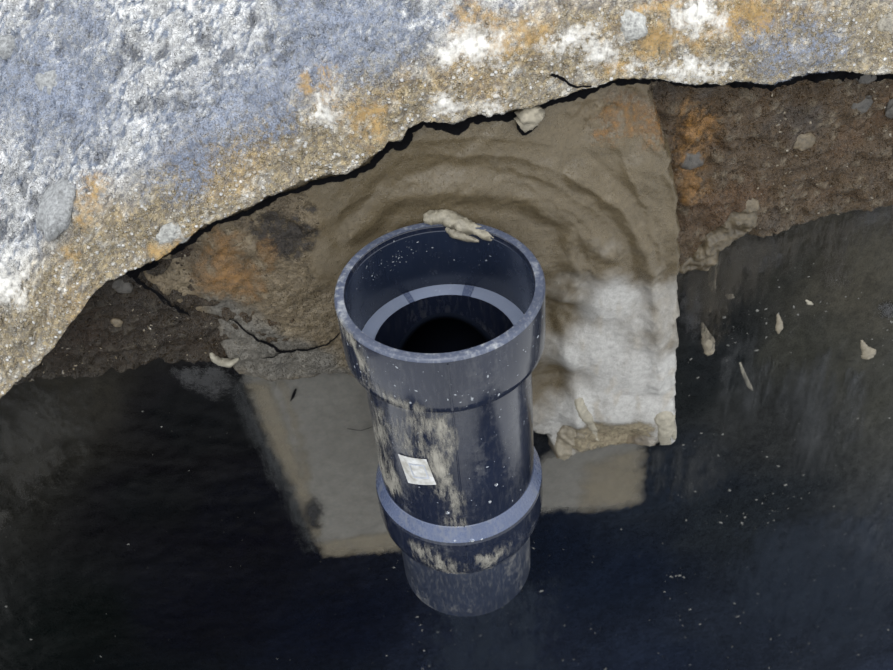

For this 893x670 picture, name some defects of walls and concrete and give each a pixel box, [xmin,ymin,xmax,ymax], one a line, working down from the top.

spalling [248,205,318,261]
crack [126,71,893,316]
spalling [514,105,545,133]
corrosion [677,101,717,202]
peeling [209,352,240,368]
crack [229,319,340,359]
peeling [245,373,397,555]
peeling [541,422,655,511]